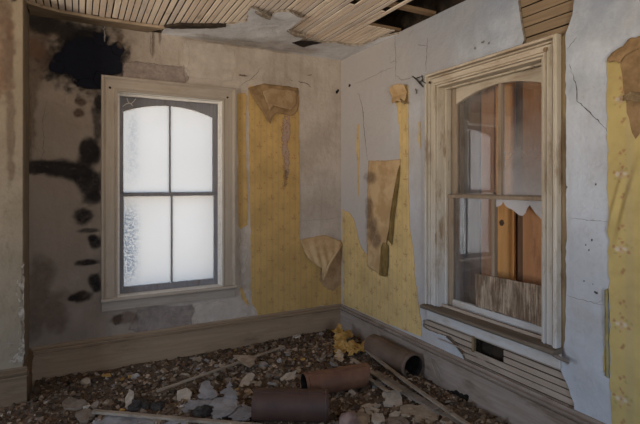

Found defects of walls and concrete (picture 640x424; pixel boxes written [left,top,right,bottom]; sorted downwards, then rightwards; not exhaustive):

flaking render [25,0,412,47]
crack [567,38,607,130]
water stain [29,13,130,248]
mould [69,274,101,302]
flaking render [425,320,574,409]